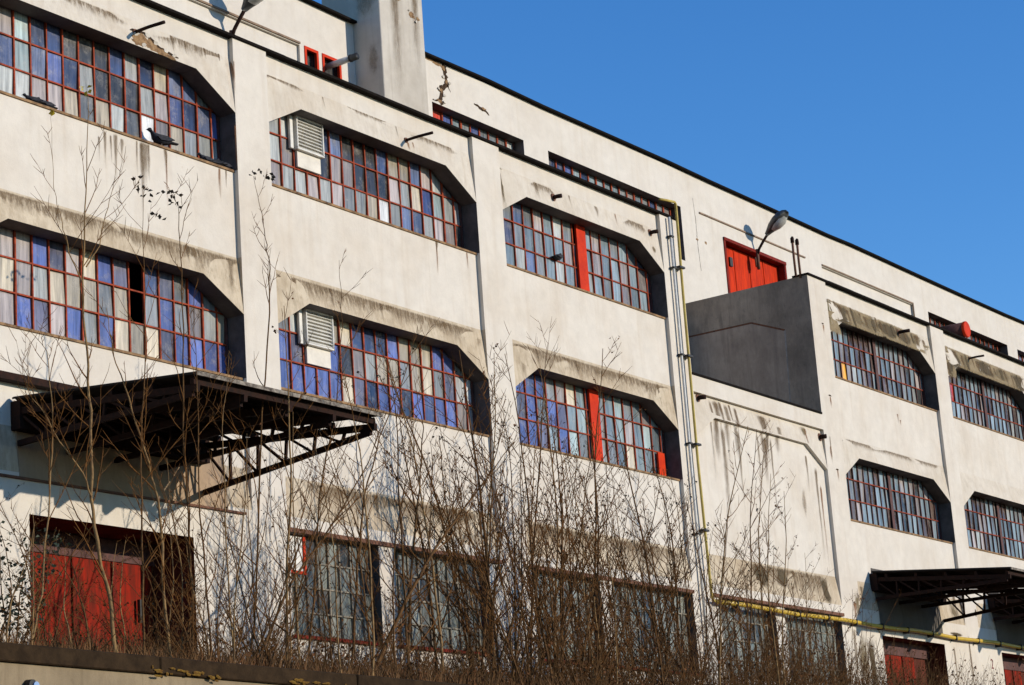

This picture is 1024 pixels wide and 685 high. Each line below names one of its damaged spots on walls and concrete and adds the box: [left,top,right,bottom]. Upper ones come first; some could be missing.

spalling [130,28,179,60]
crack [425,57,451,105]
water stain [136,143,149,174]
water stain [710,403,742,479]
water stain [757,416,780,473]